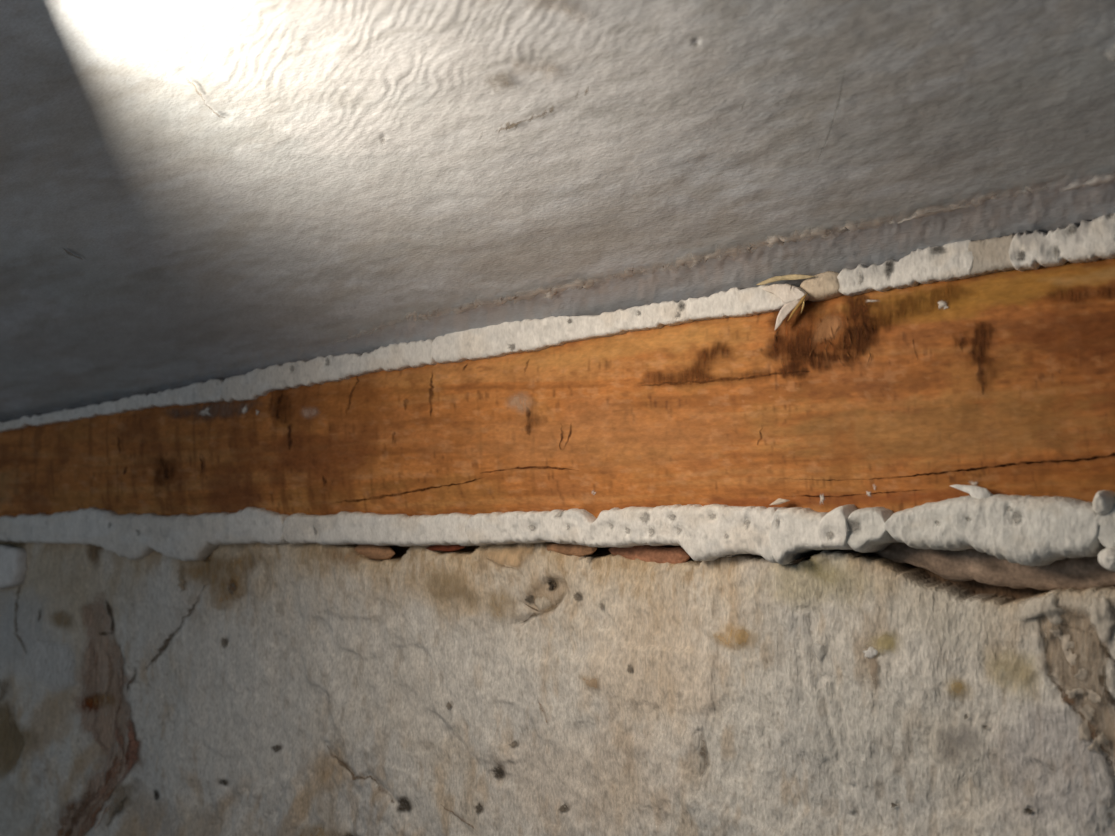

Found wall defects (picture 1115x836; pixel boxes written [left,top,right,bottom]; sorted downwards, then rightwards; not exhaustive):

crack [127,589,203,690]
spalling [1047,608,1115,753]